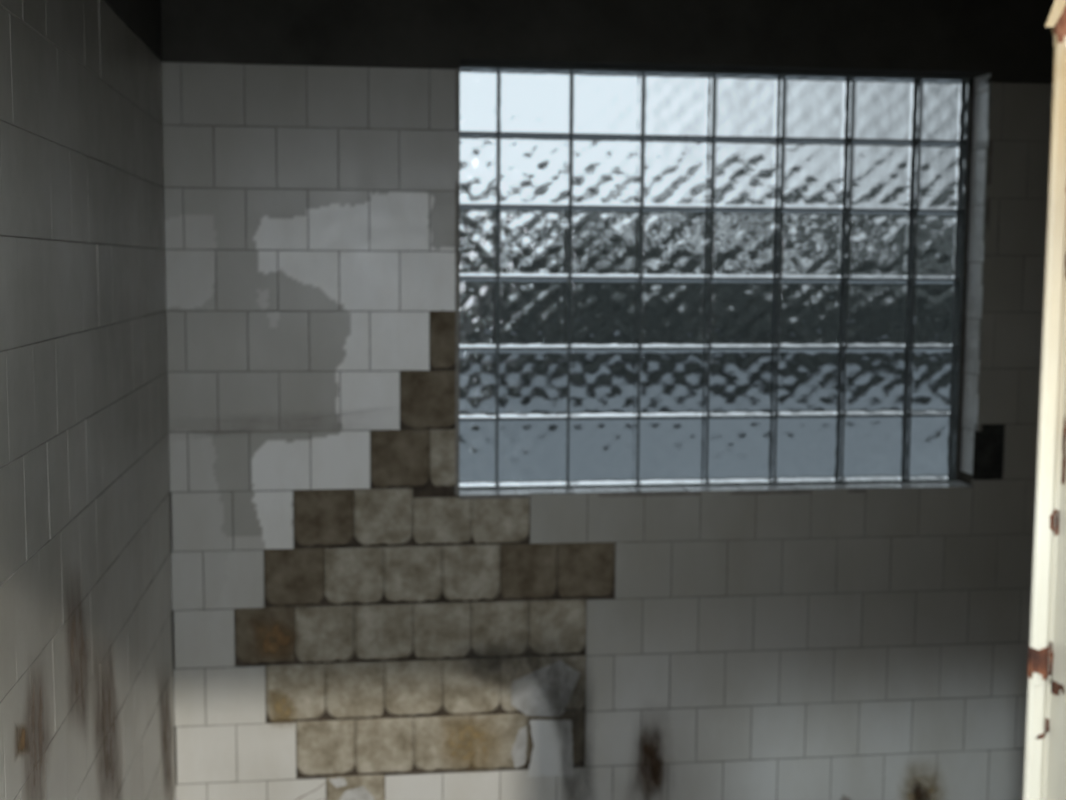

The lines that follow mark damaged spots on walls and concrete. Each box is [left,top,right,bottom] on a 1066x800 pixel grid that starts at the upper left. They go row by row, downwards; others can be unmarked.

peeling [1045,0,1066,48]
spalling [235,311,615,800]